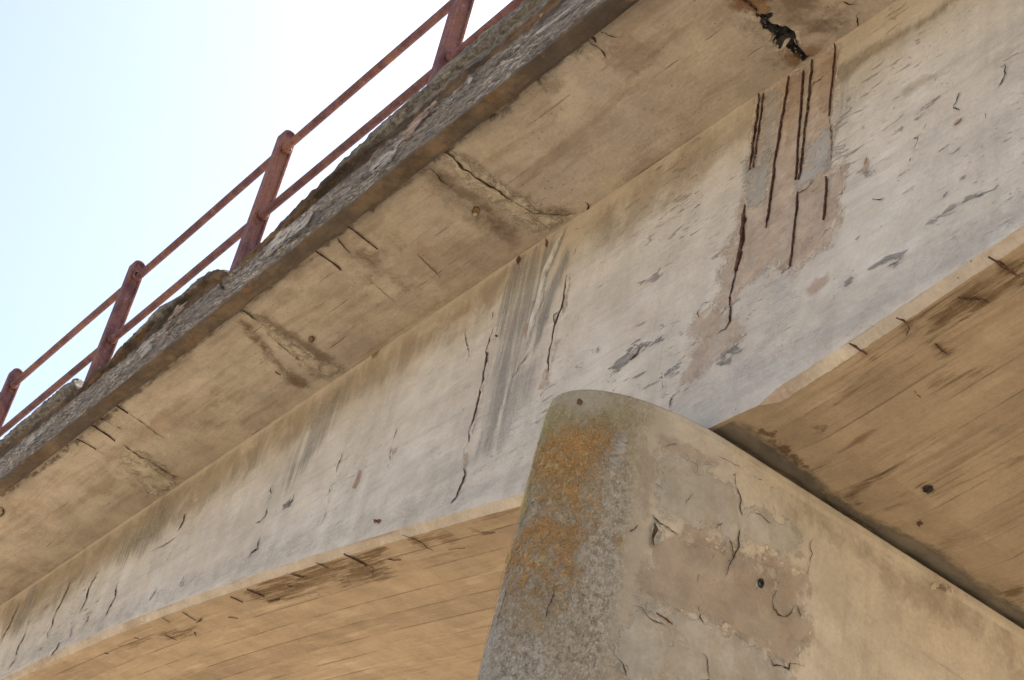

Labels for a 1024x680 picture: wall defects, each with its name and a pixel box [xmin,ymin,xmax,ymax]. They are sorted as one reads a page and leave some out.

crack [430,152,590,216]
spalling [716,0,849,334]
water stain [444,149,576,431]
crack [451,248,576,502]
peeling [651,450,804,560]
water stain [248,547,393,603]
peeling [610,598,802,680]